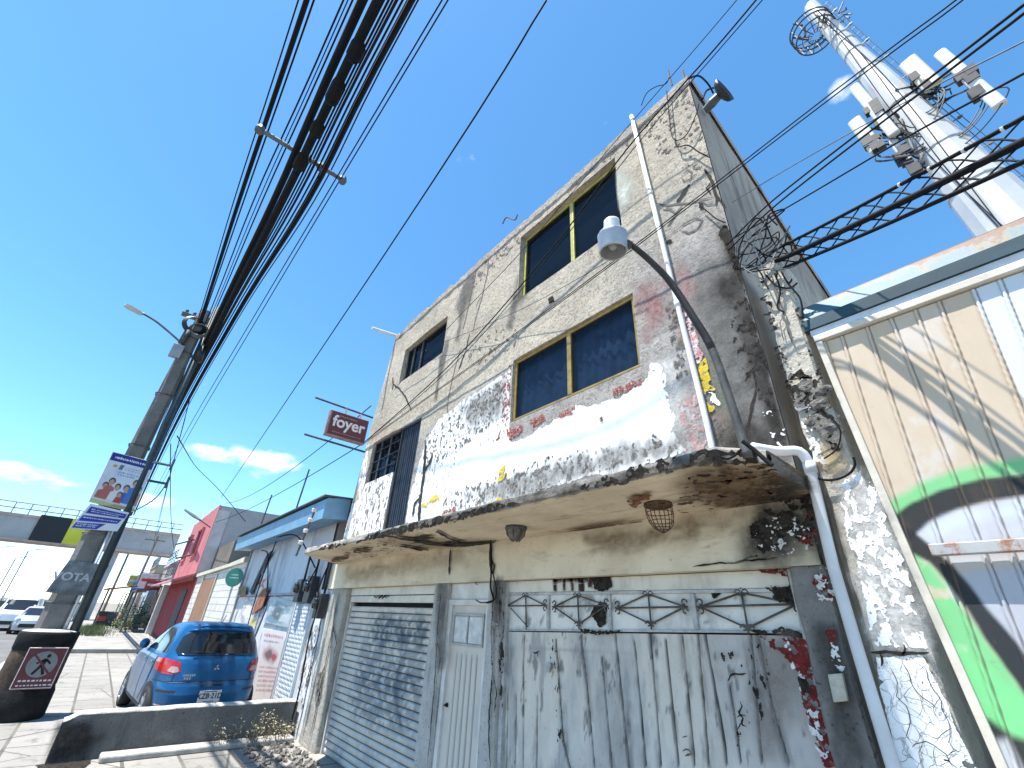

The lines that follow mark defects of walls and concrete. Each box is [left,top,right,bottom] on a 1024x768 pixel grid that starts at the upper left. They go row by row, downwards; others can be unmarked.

spalling [718,225,843,465]
peeling [319,301,818,577]
leakage [569,522,623,544]
leakage [688,469,828,563]
peeling [721,629,835,768]
peeling [812,567,835,602]
peeling [825,630,845,671]
peeling [838,471,976,768]
crack [870,645,959,768]